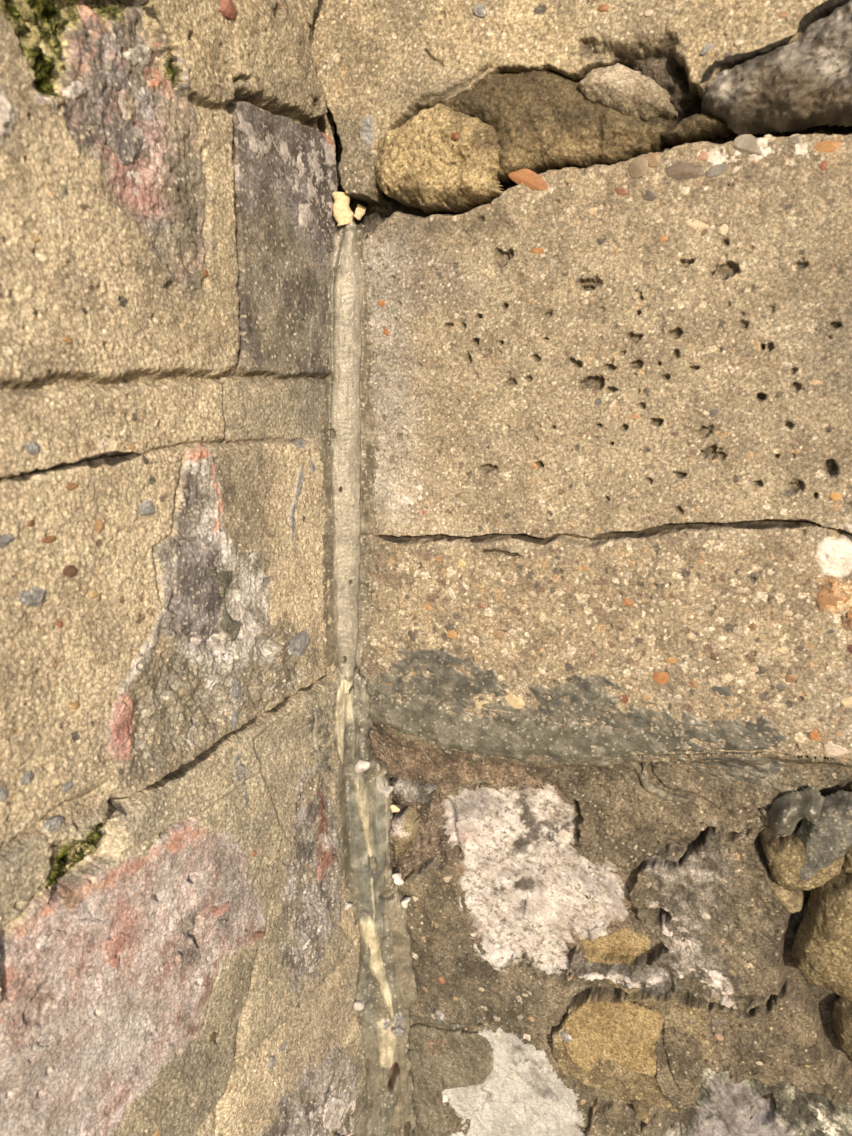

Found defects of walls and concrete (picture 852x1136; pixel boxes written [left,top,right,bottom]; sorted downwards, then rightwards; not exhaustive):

crack [699,0,849,84]
crack [317,116,327,134]
crack [0,450,143,484]
crack [374,519,852,557]
spalling [101,442,283,768]
crack [105,675,327,819]